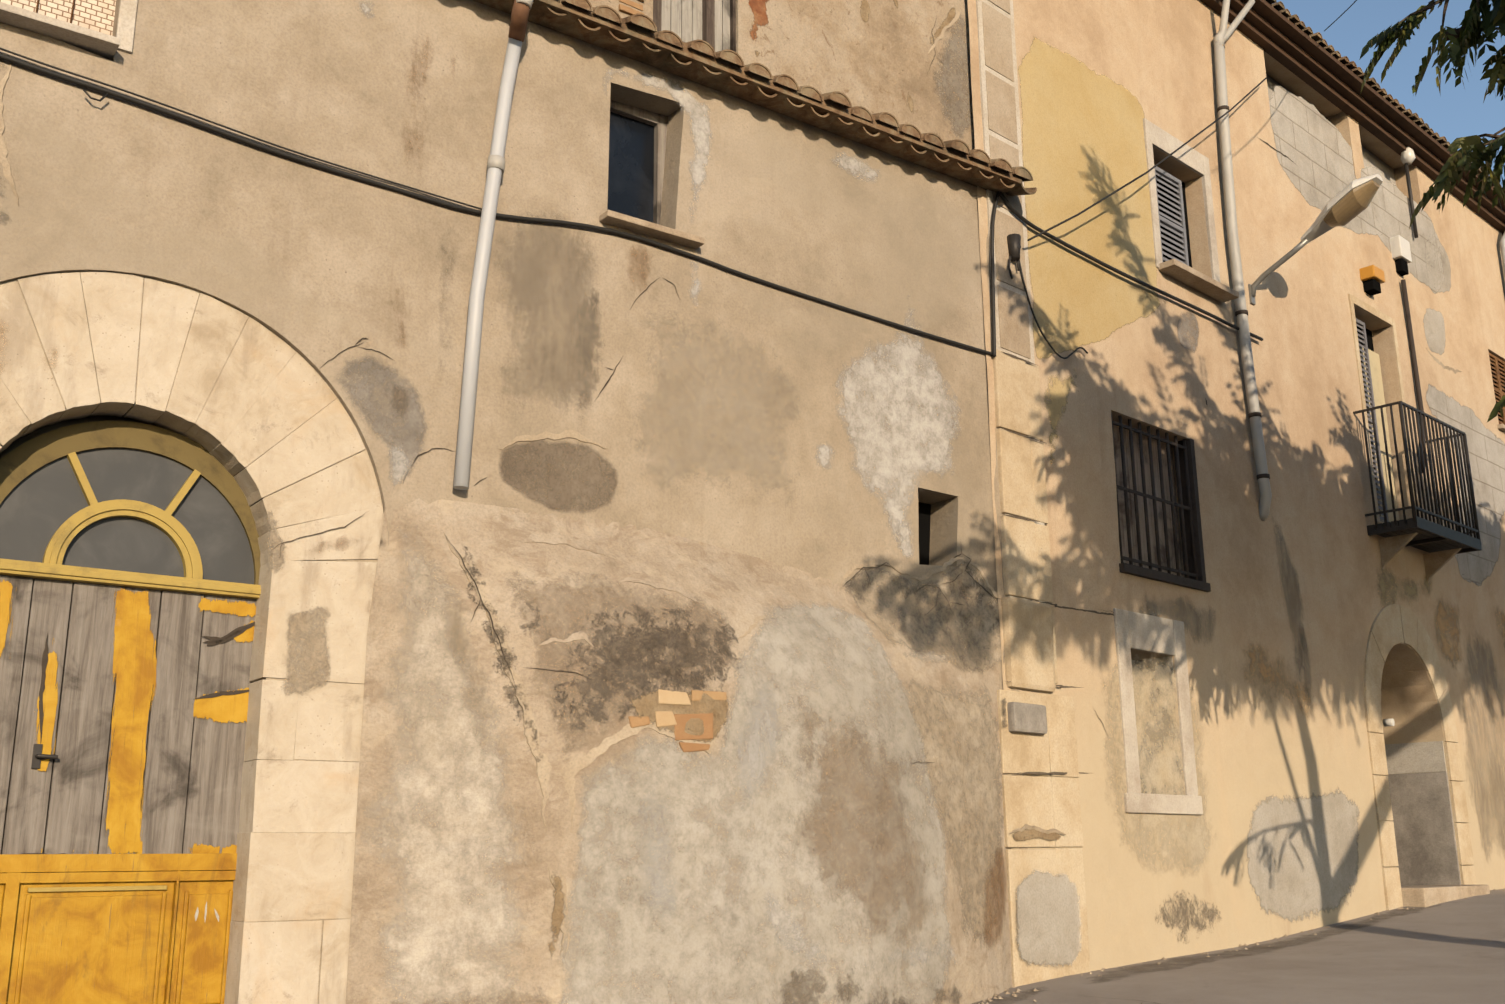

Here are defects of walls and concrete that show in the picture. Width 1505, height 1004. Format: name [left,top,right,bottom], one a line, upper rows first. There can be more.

peeling [1270,86,1462,374]
flaking render [1426,384,1505,586]
peeling [36,640,58,771]
peeling [92,588,157,854]
peeling [193,688,249,724]
peeling [198,598,256,643]
leakage [463,546,537,739]
crack [445,535,593,681]
peeling [371,533,729,1004]
leakage [522,576,741,734]
crack [845,550,999,615]
spalling [841,557,1007,671]